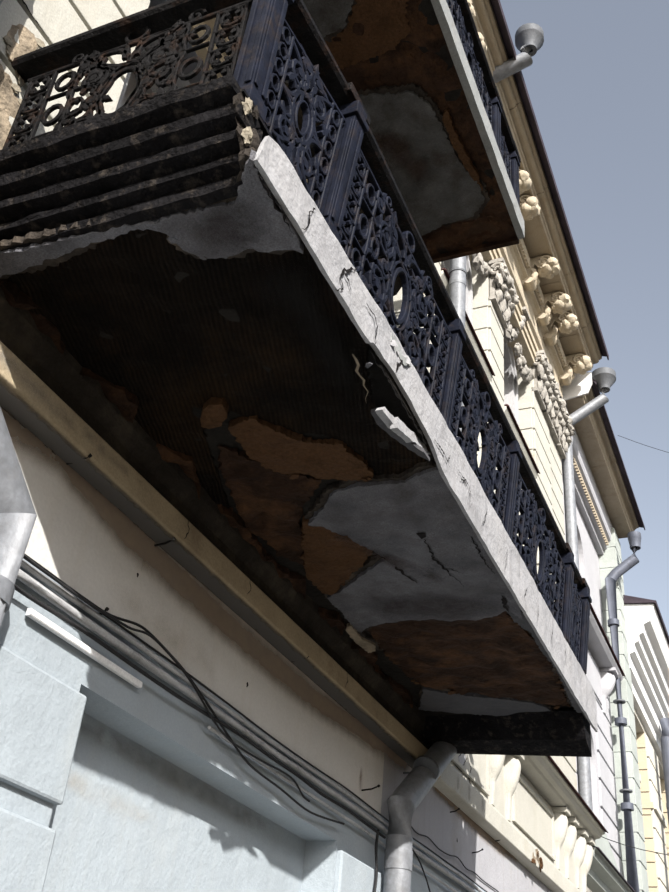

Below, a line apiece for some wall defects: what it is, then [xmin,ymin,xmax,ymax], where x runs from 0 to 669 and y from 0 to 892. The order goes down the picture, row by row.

spalling [0,24,45,150]
spalling [233,88,261,173]
peeling [325,0,517,257]
crack [335,267,357,291]
spalling [7,229,431,595]
crack [435,440,508,574]
crack [424,539,464,586]
peeling [368,611,570,709]
crack [501,590,566,653]